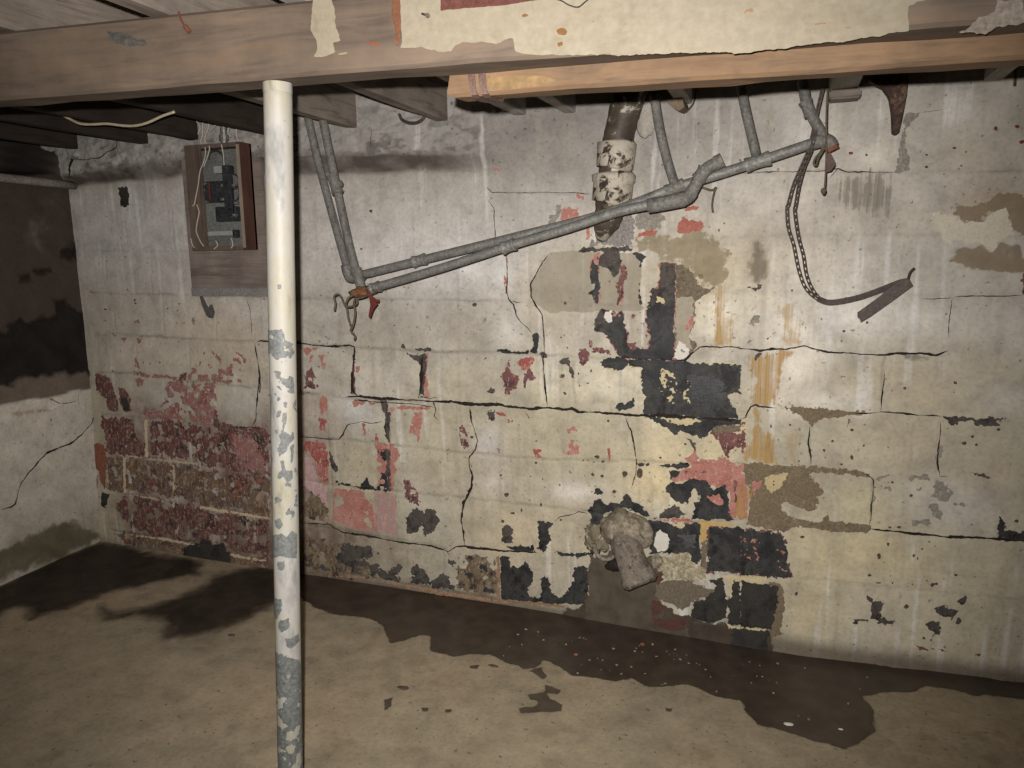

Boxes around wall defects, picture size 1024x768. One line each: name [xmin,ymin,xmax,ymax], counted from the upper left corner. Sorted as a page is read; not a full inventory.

peeling [932,208,1014,252]
damp [0,300,90,386]
damp [0,523,201,620]
damp [107,568,274,637]
peeling [94,329,593,609]
crack [296,188,773,554]
damp [300,550,1024,749]
peeling [549,205,895,653]
rust [745,307,799,463]
crack [675,295,1020,477]
peeling [917,596,967,652]
crack [866,473,1022,542]